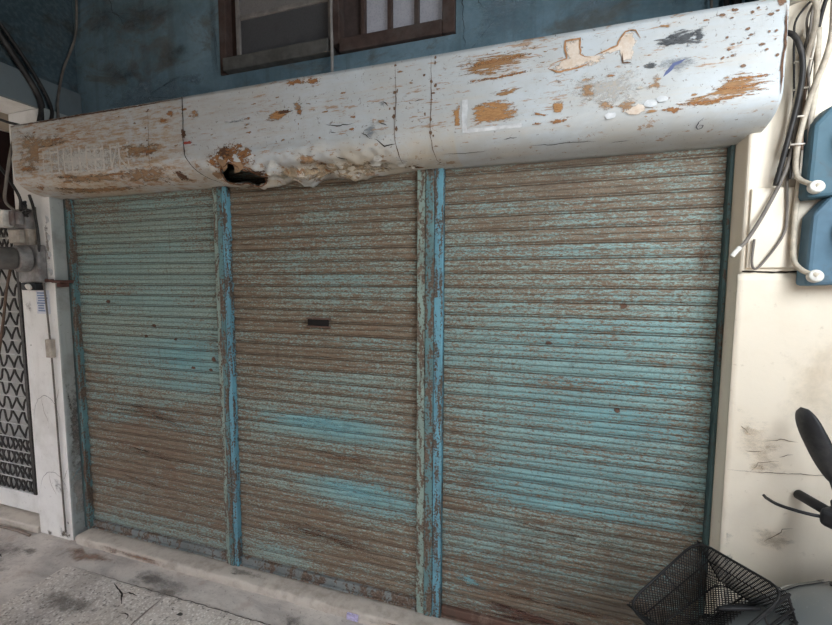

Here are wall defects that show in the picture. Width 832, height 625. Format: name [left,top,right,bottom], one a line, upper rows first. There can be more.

peeling [604,96,668,119]
peeling [212,159,243,179]
crack [736,426,823,476]
corrosion [490,605,575,625]